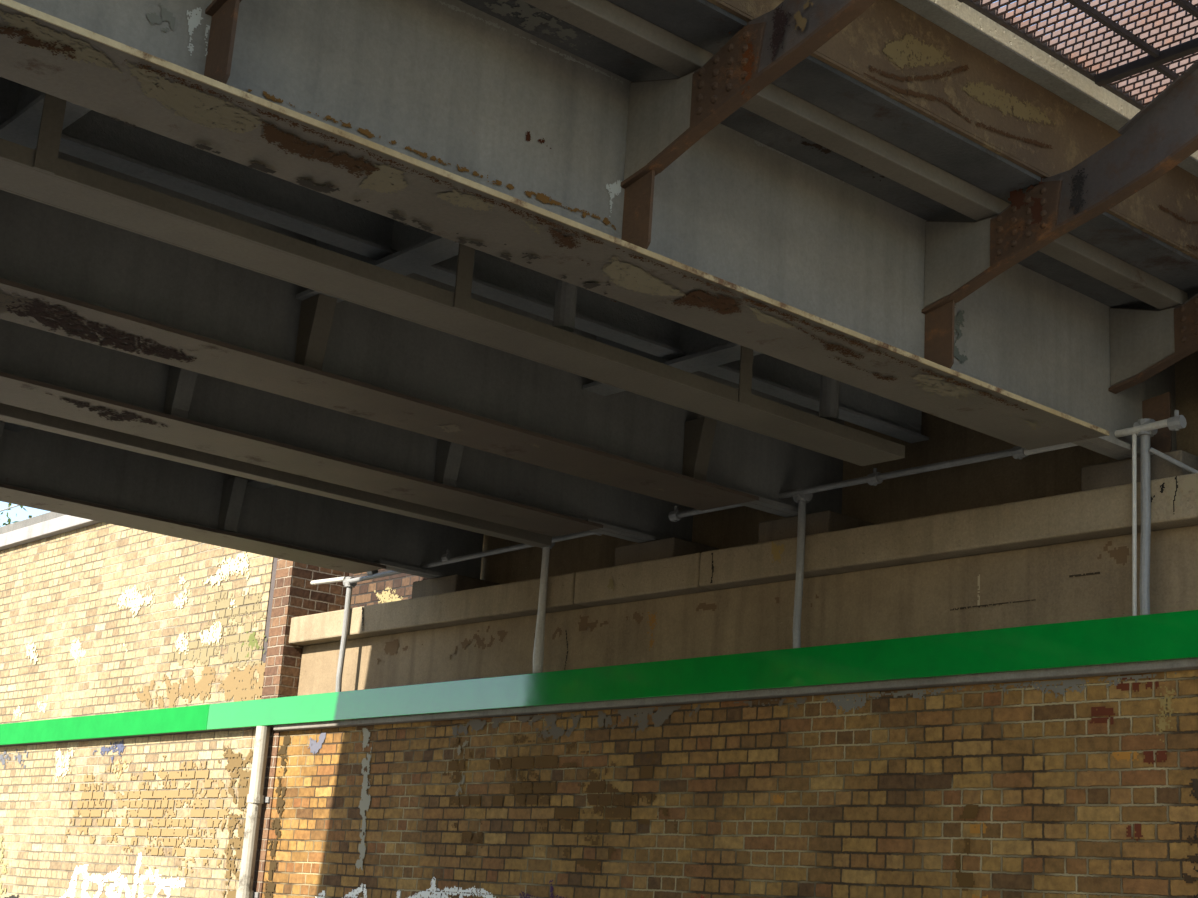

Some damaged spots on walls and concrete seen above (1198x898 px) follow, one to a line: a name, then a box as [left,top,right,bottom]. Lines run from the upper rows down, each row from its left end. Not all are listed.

corrosion [0,26,76,60]
corrosion [124,60,1052,410]
corrosion [6,297,198,363]
peeling [117,584,155,618]
peeling [170,553,250,610]
peeling [175,621,222,655]
leakage [355,728,372,871]
leakage [1182,836,1198,898]